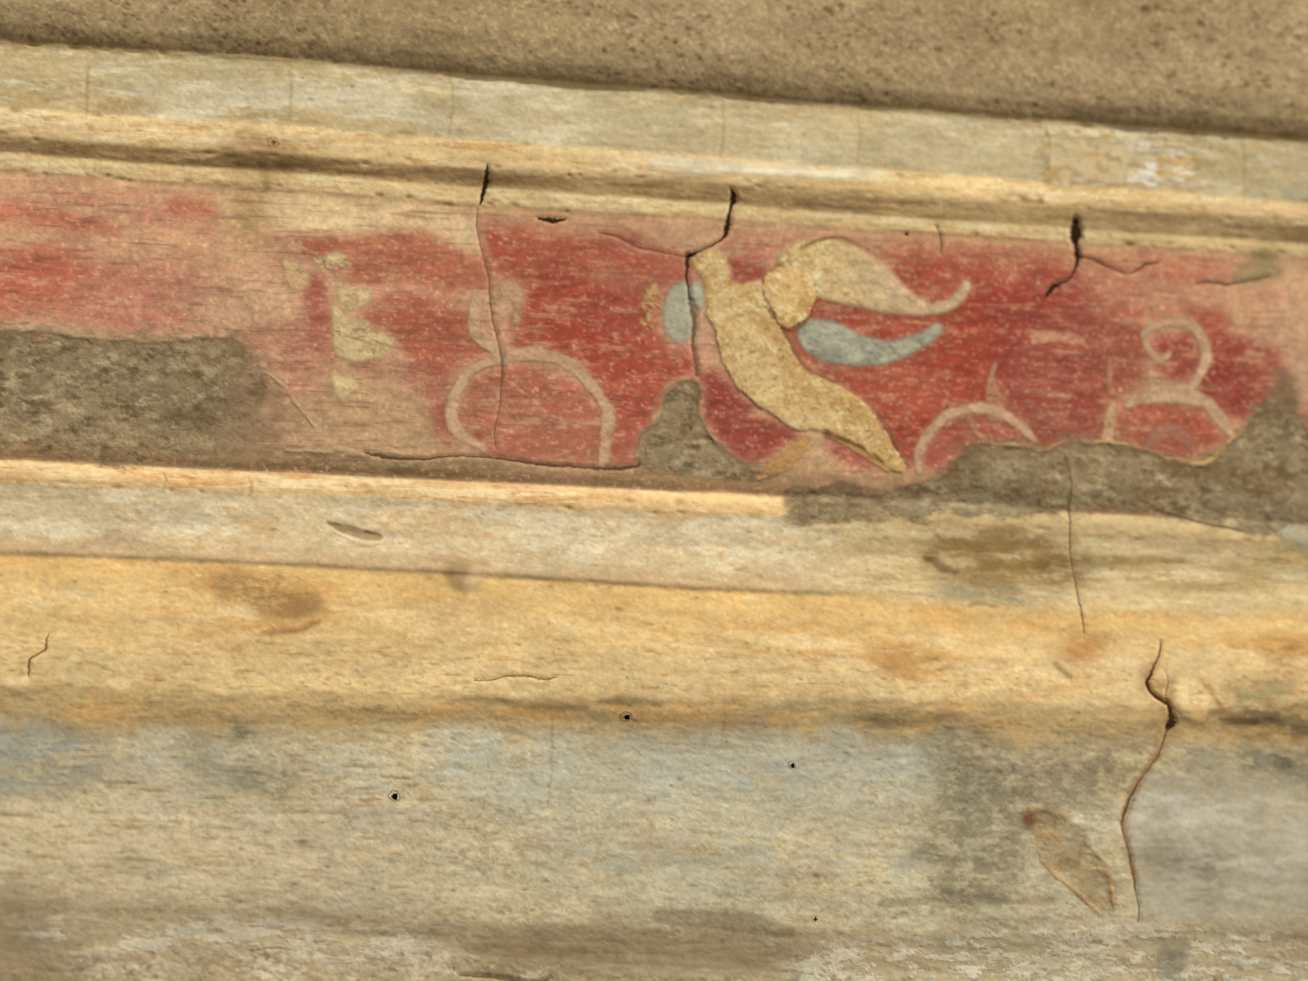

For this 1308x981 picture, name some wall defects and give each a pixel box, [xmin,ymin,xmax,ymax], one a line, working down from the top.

crack [365,165,641,470]
crack [598,188,738,376]
crack [1045,217,1160,297]
spalling [0,324,316,469]
spalling [636,376,774,481]
spalling [784,385,1308,535]
damp [221,578,320,631]
crack [1121,642,1177,922]